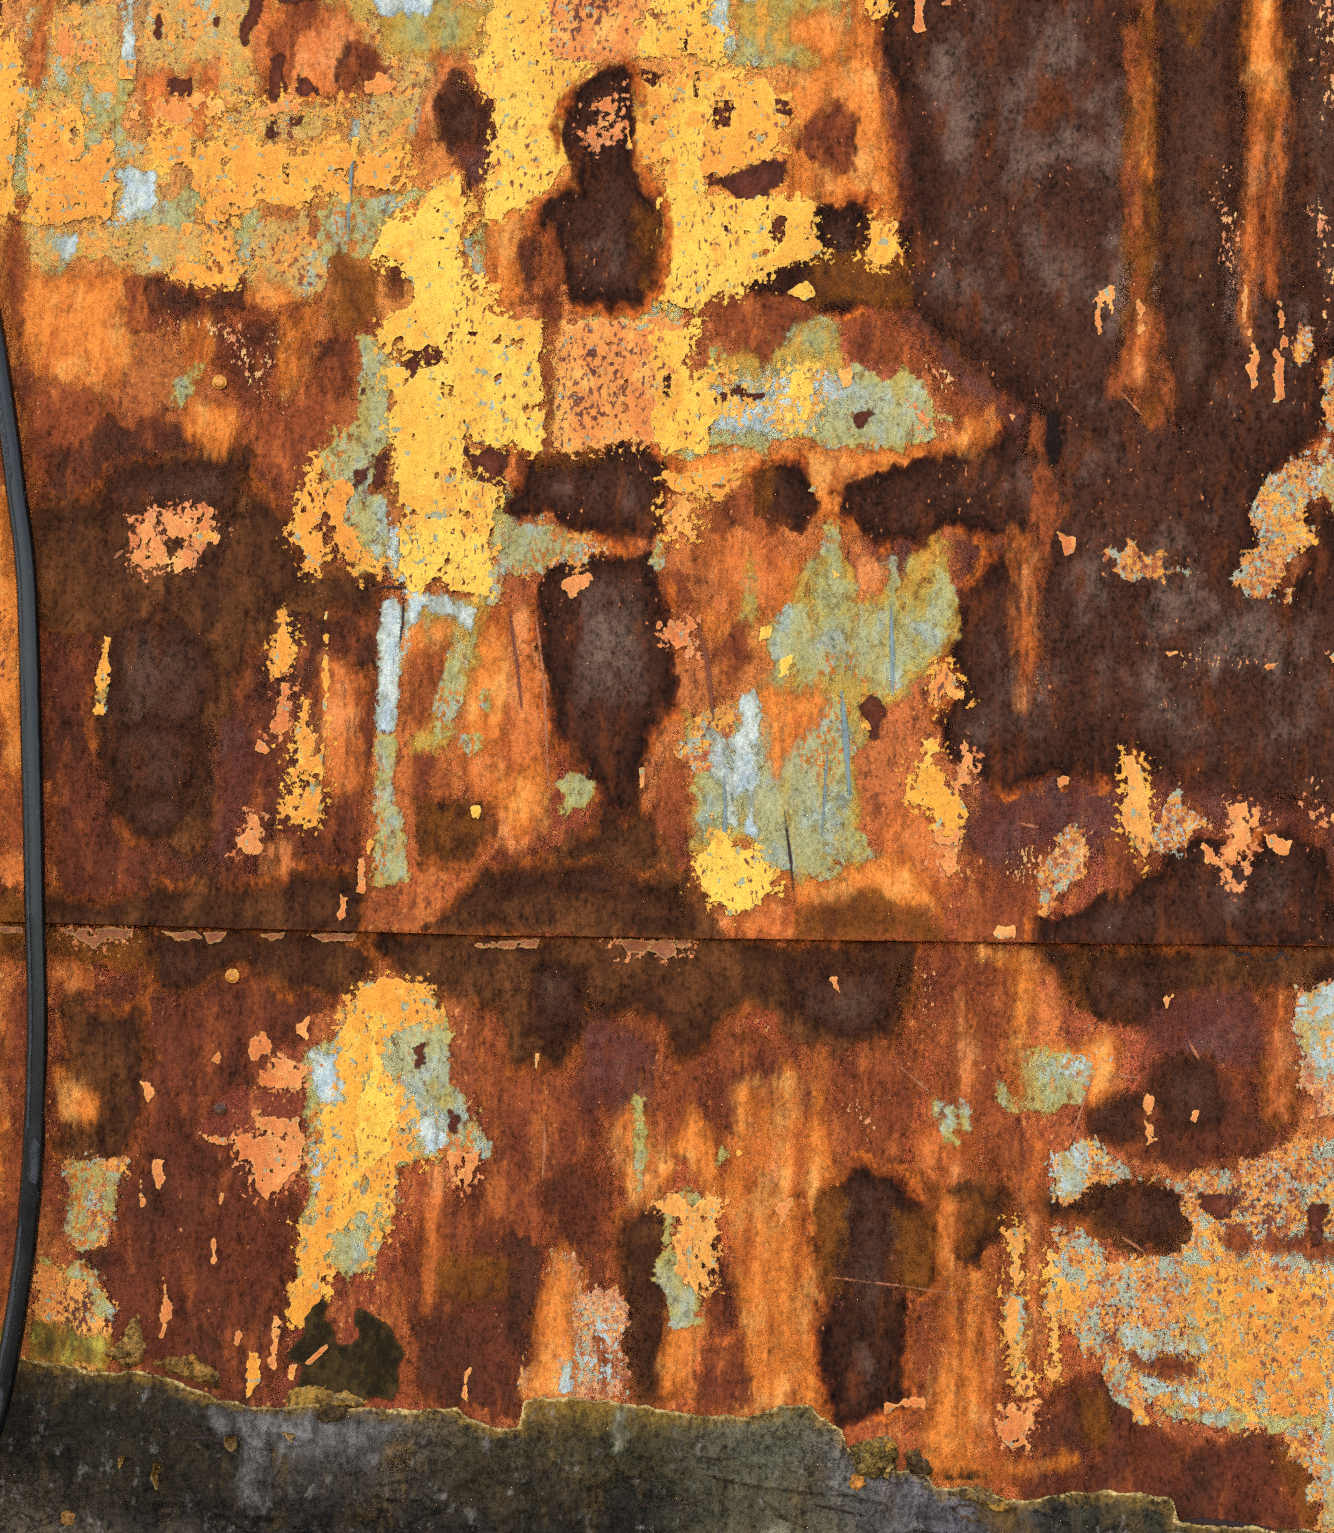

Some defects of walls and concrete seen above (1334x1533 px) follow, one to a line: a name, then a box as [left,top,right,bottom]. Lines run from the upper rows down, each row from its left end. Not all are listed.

corrosion [405,51,498,192]
peeling [0,0,995,926]
corrosion [463,0,1334,852]
peeling [1228,357,1334,604]
corrosion [1024,820,1334,945]
corrosion [1033,943,1334,1173]
leakage [29,1320,111,1372]
leakage [208,1408,392,1513]
peeling [199,971,493,1424]
leakage [610,1411,632,1457]
leakage [761,1517,799,1533]
peeling [980,978,1334,1533]